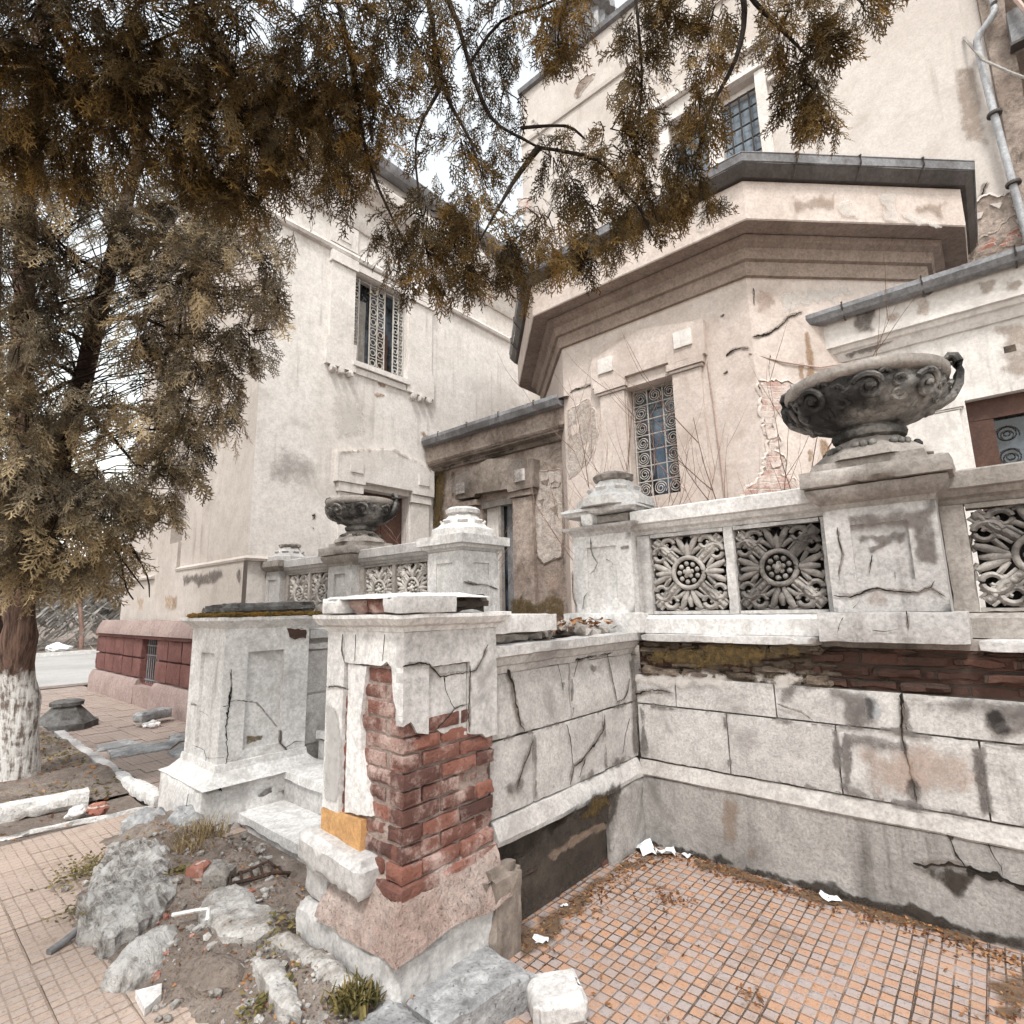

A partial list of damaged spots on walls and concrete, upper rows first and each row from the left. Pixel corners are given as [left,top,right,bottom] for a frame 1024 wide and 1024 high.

spalling [968,191,1024,262]
crack [726,311,802,389]
flaking render [535,397,599,565]
spalling [740,378,798,496]
crack [834,528,947,633]
crack [191,670,301,792]
crack [558,653,671,785]
leakage [521,856,604,919]
leakage [517,784,621,878]
leakage [652,841,733,865]
leakage [745,865,1024,950]
crack [913,835,1024,891]